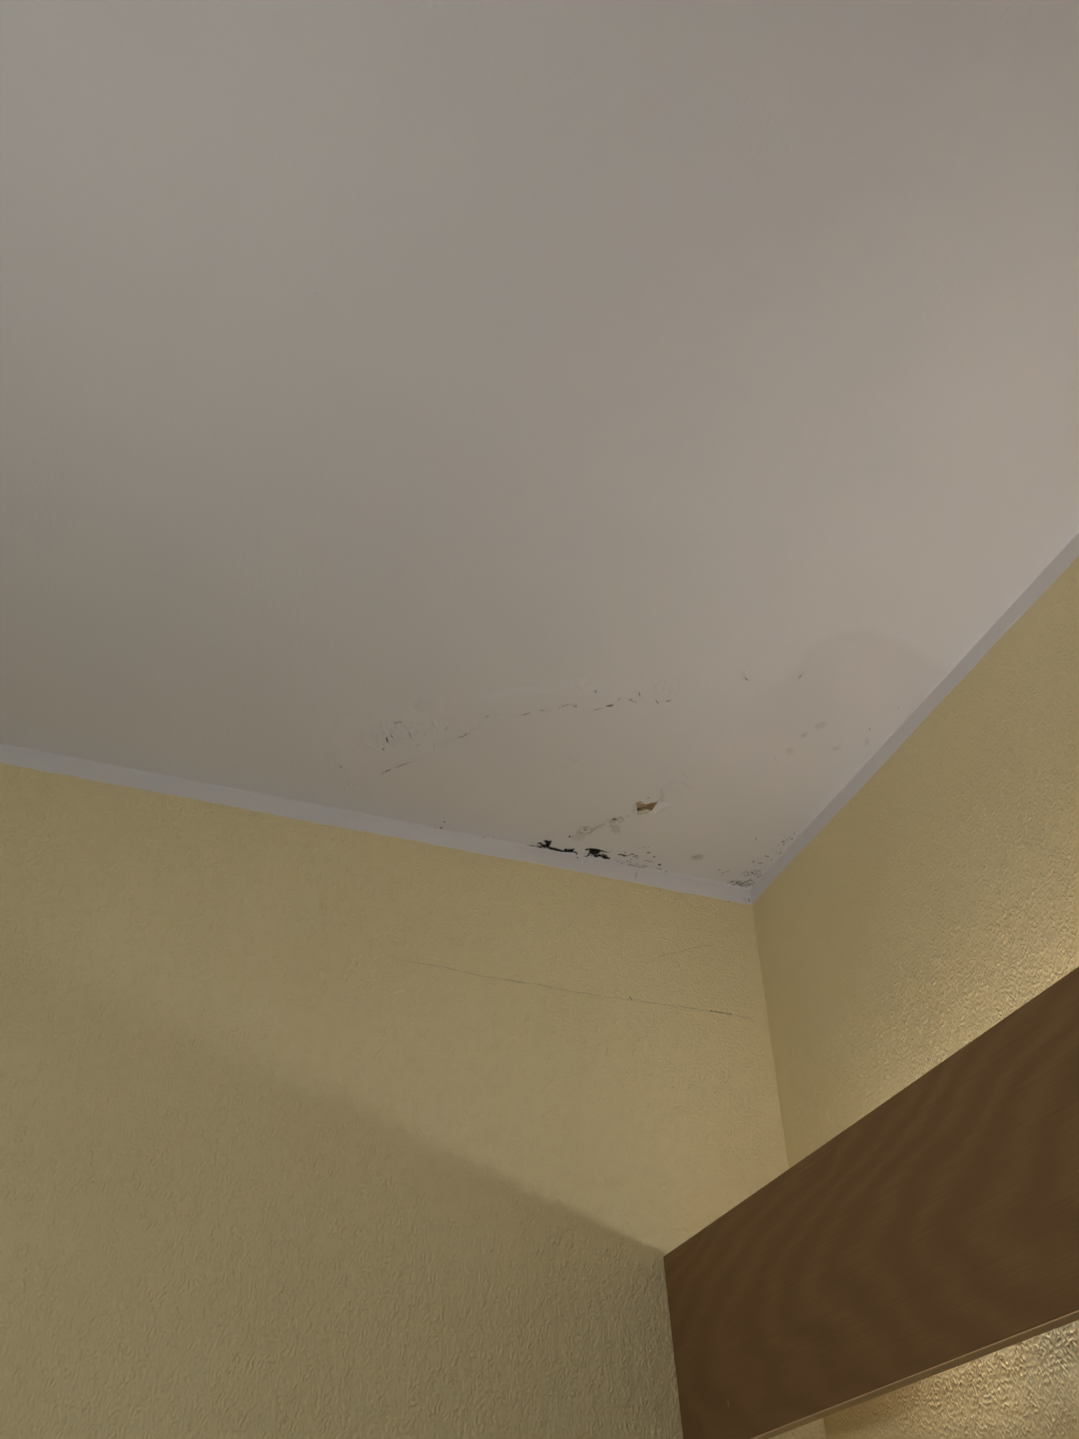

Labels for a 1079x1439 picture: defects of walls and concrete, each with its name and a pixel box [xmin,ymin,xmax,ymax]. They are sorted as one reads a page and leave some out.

leakage [529,829,661,868]